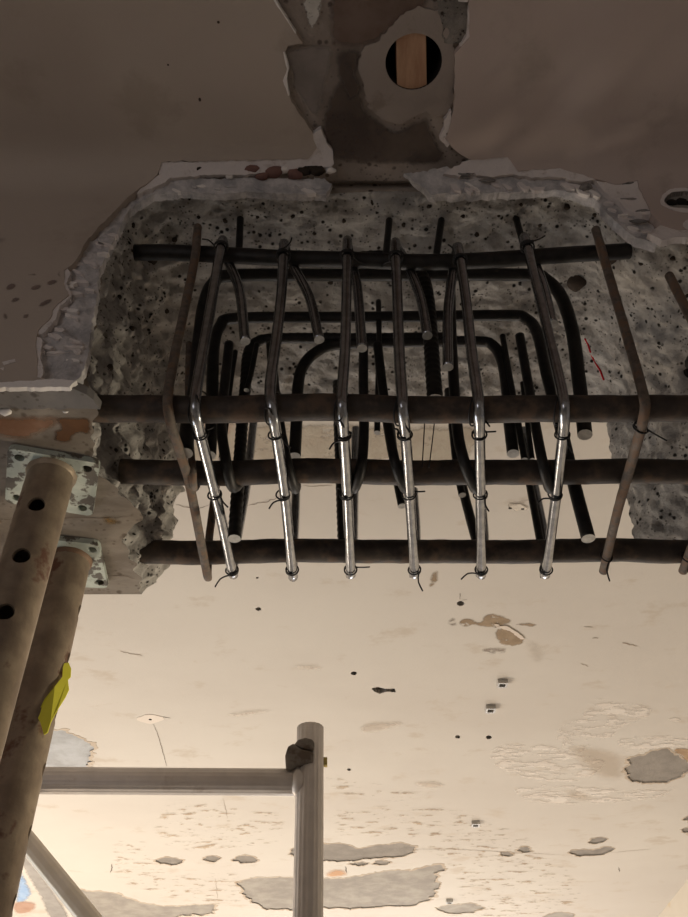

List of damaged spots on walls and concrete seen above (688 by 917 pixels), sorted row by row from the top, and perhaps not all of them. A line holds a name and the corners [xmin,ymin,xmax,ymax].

spalling [0,0,688,396]
spalling [503,422,535,460]
spalling [566,422,593,460]
spalling [227,486,244,543]
spalling [336,484,344,539]
spalling [456,485,476,540]
spalling [508,485,544,539]
spalling [567,484,596,543]
spalling [46,728,98,767]
spalling [621,747,688,785]
spalling [234,876,293,911]
spalling [323,842,485,914]